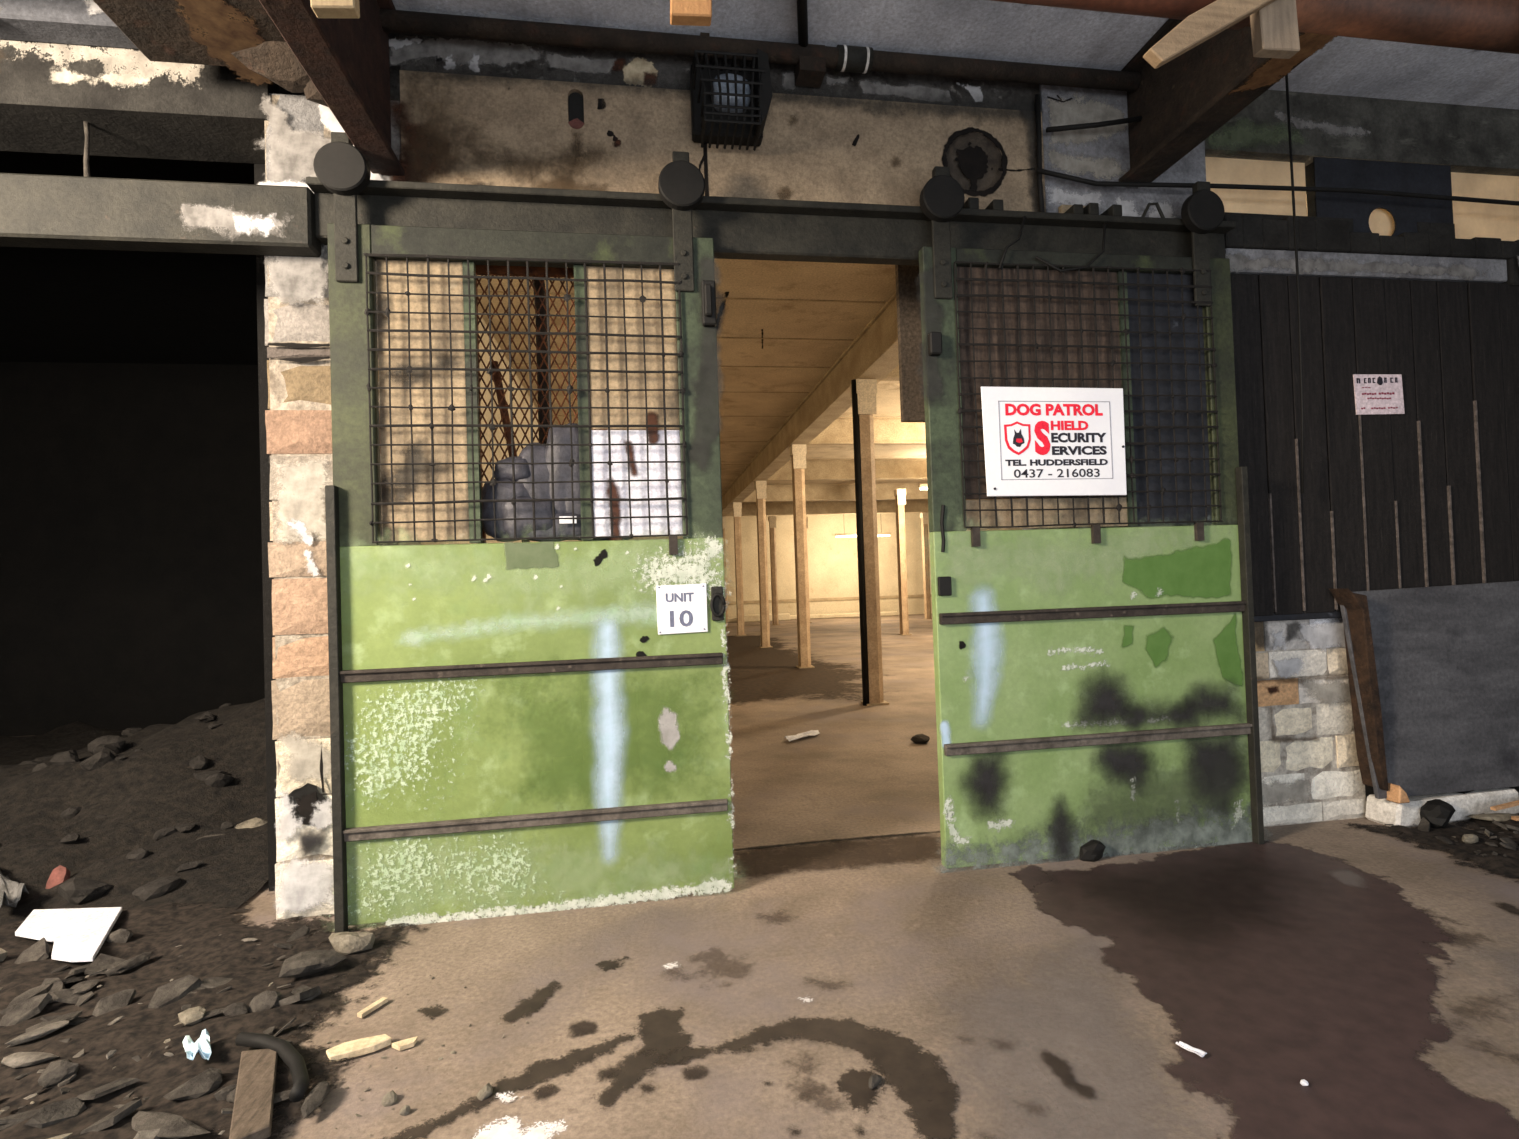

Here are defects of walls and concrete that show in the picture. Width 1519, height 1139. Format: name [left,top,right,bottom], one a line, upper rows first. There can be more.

peeling [85,0,101,14]
peeling [0,39,205,89]
rust [1228,33,1337,95]
peeling [258,96,354,189]
peeling [180,204,290,238]
peeling [266,246,328,305]
water stain [1008,840,1519,1139]